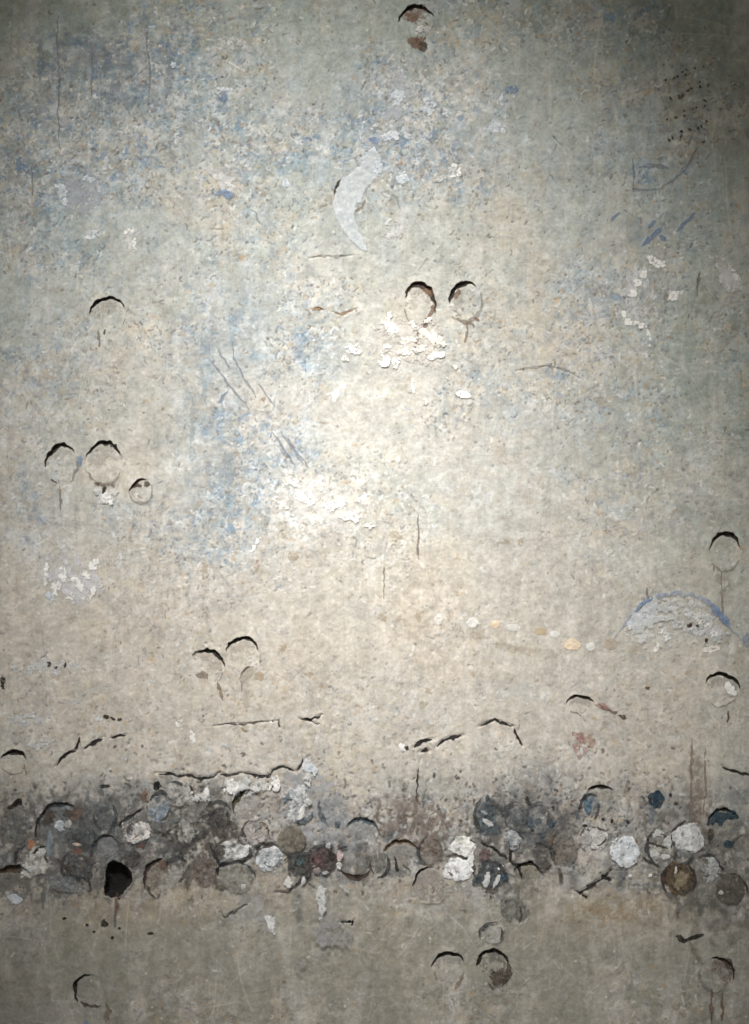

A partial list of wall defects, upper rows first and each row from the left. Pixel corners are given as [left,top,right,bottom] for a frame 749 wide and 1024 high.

rust [407,35,427,52]
peeling [333,67,453,252]
peeling [684,611,723,654]
crack [57,734,126,765]
water stain [0,784,249,898]
crack [160,757,308,781]
crack [219,715,321,727]
water stain [277,771,367,885]
water stain [376,796,449,865]
crack [414,718,523,802]
water stain [669,744,739,848]
spalling [85,860,135,939]